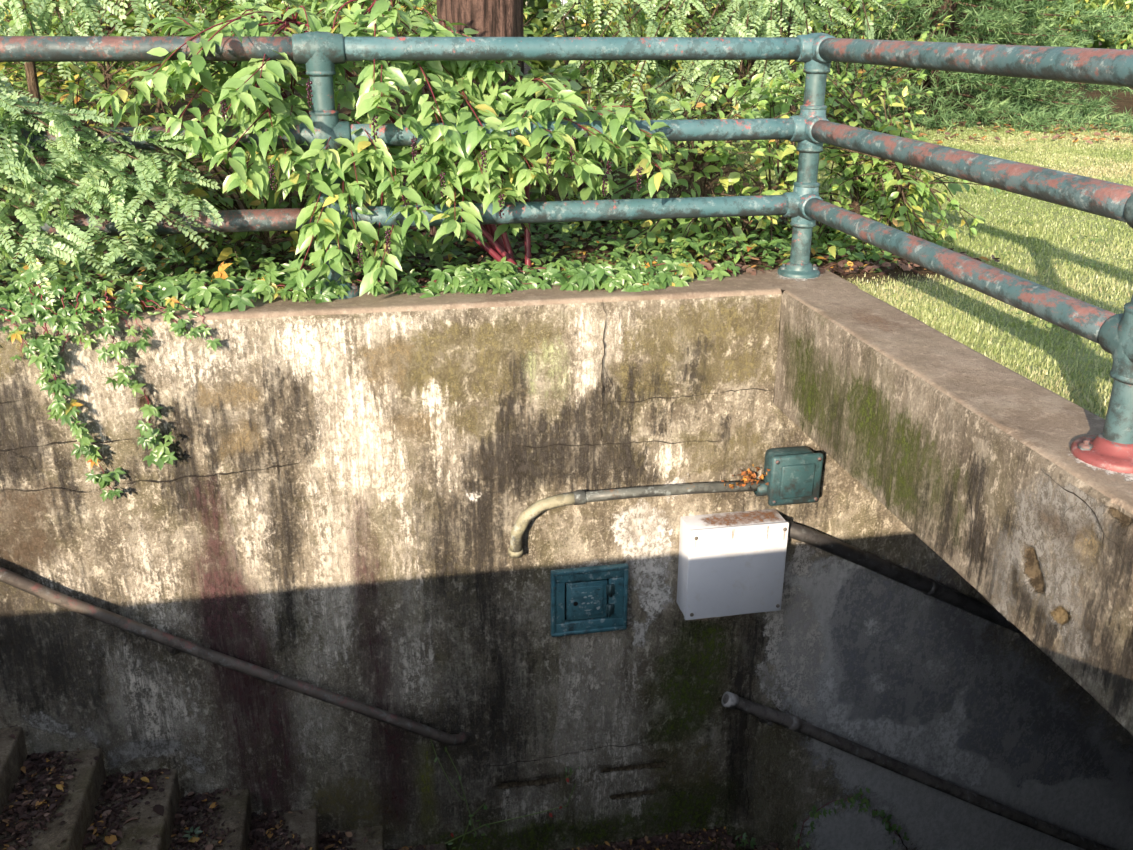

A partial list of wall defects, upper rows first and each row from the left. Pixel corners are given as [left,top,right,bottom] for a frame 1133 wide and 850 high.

damp [65,333,132,444]
damp [0,453,85,595]
crack [0,439,136,493]
damp [80,629,206,757]
damp [122,529,196,634]
crack [123,463,297,501]
damp [151,299,777,676]
peeling [755,542,991,787]
damp [722,513,1133,850]
spalling [1023,545,1046,594]
spalling [1050,606,1071,625]
crack [1042,470,1125,564]